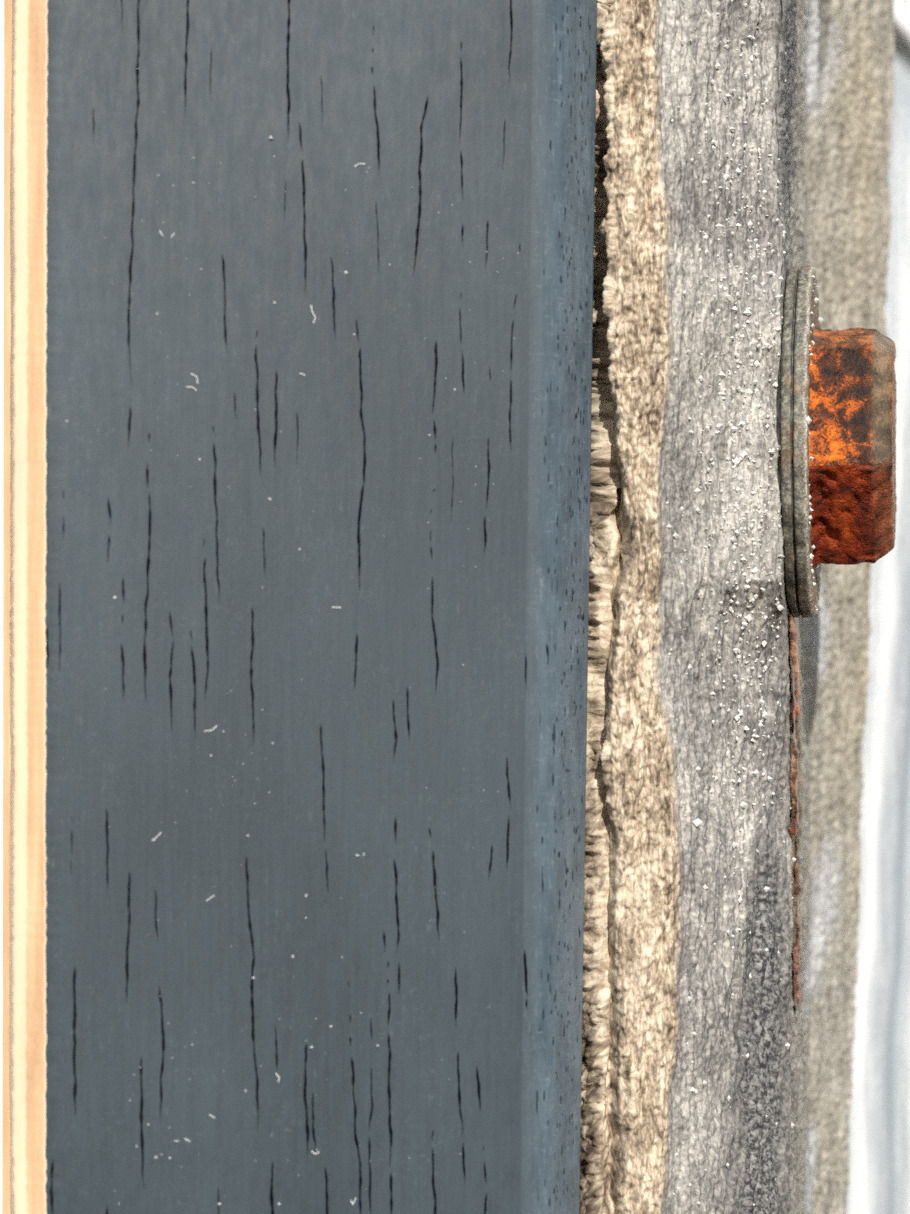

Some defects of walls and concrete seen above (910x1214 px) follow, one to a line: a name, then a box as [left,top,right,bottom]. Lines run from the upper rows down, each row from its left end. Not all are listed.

corrosion [789,614,805,1011]
damp [731,834,841,1214]